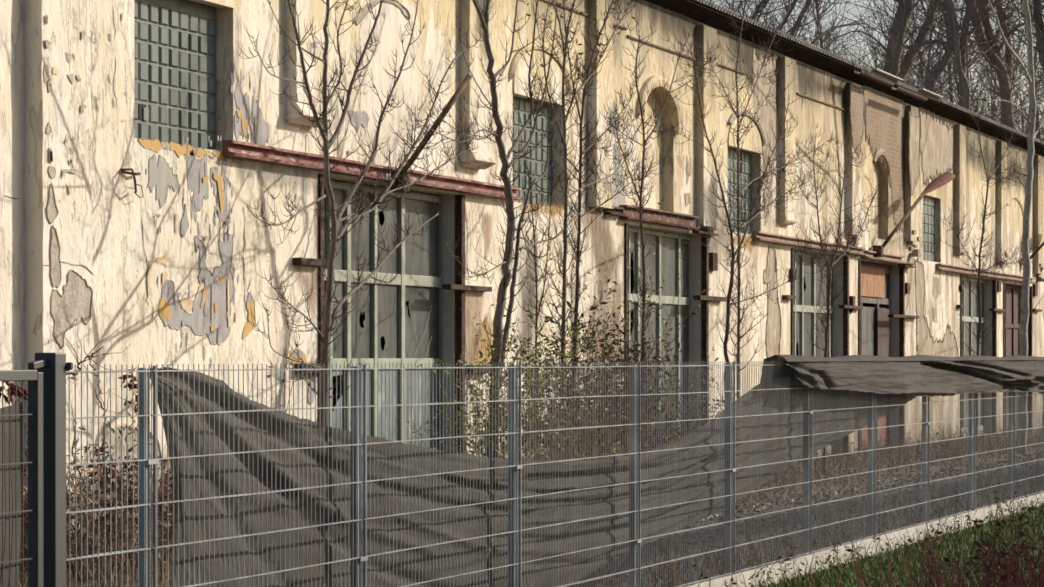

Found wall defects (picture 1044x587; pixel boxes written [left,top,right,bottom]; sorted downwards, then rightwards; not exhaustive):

flaking render [43,52,81,93]
peeling [231,64,270,146]
flaking render [45,148,93,349]
peeling [137,136,256,367]